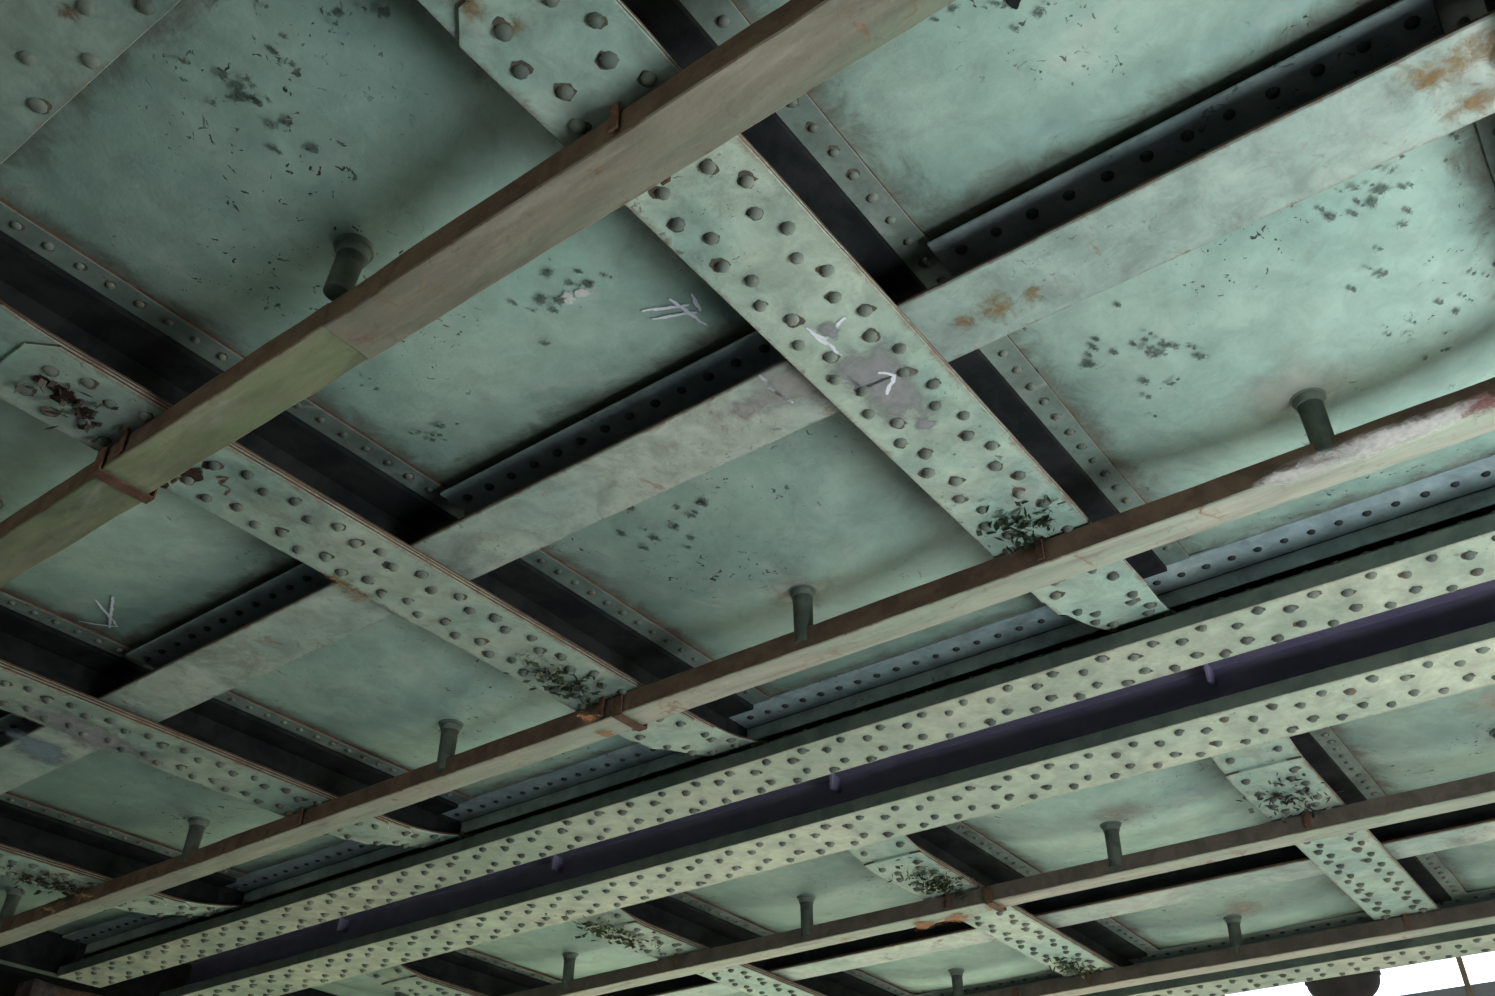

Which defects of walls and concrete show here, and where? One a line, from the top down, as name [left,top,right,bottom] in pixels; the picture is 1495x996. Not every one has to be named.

rust [1411,31,1495,90]
rust [1448,90,1492,116]
peeling [818,323,839,339]
rust [32,375,98,421]
peeling [734,365,821,419]
peeling [836,344,936,429]